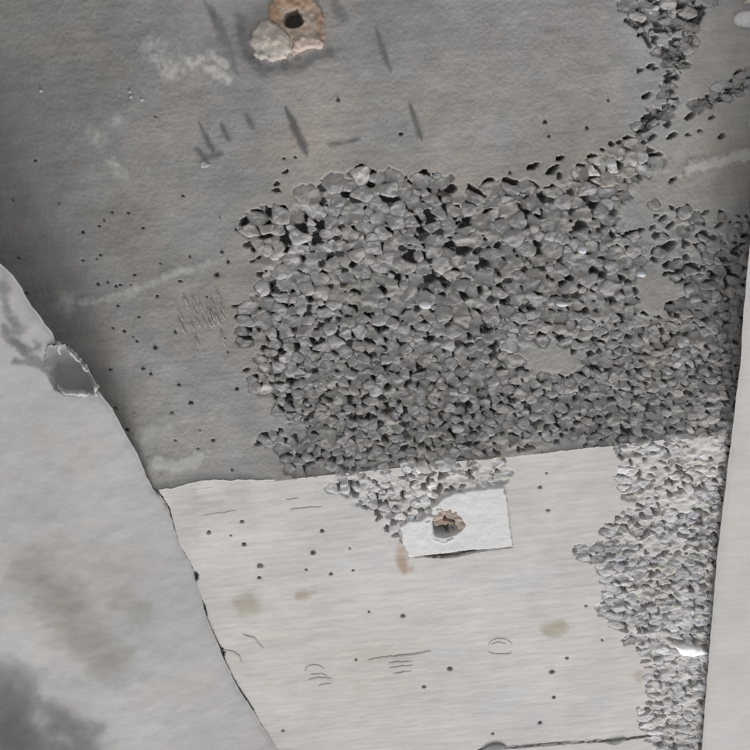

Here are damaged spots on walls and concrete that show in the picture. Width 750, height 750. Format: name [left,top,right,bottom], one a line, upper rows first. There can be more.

flaking render [617,0,718,139]
flaking render [690,68,750,113]
flaking render [238,203,342,319]
flaking render [293,166,445,292]
flaking render [384,256,505,330]
flaking render [480,281,524,327]
flaking render [409,172,617,259]
flaking render [547,273,623,310]
spalling [44,341,99,397]
flaking render [357,457,477,521]
water stain [0,684,85,750]
spalling [670,640,709,724]